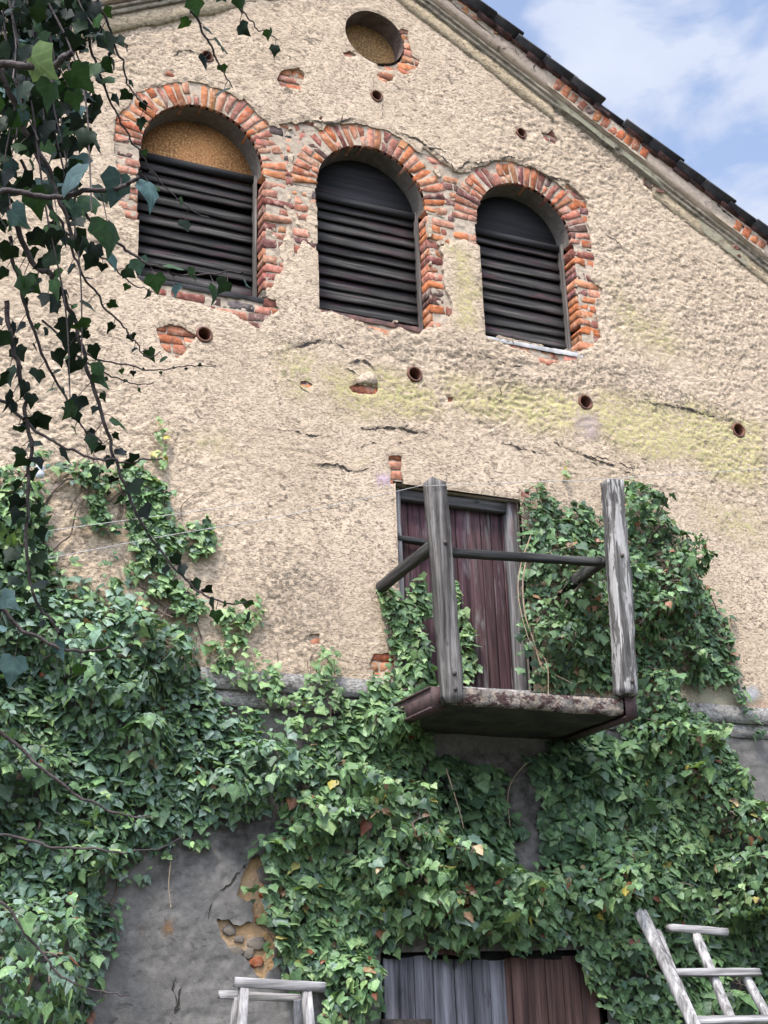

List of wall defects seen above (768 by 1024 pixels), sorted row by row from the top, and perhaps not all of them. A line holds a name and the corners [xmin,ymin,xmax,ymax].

flaking render [277,67,305,90]
crack [403,133,588,199]
flaking render [114,71,603,370]
peeling [349,372,378,395]
crack [648,401,715,417]
crack [319,425,427,474]
flaking render [388,455,421,488]
crack [502,441,637,478]
flaking render [216,850,289,979]